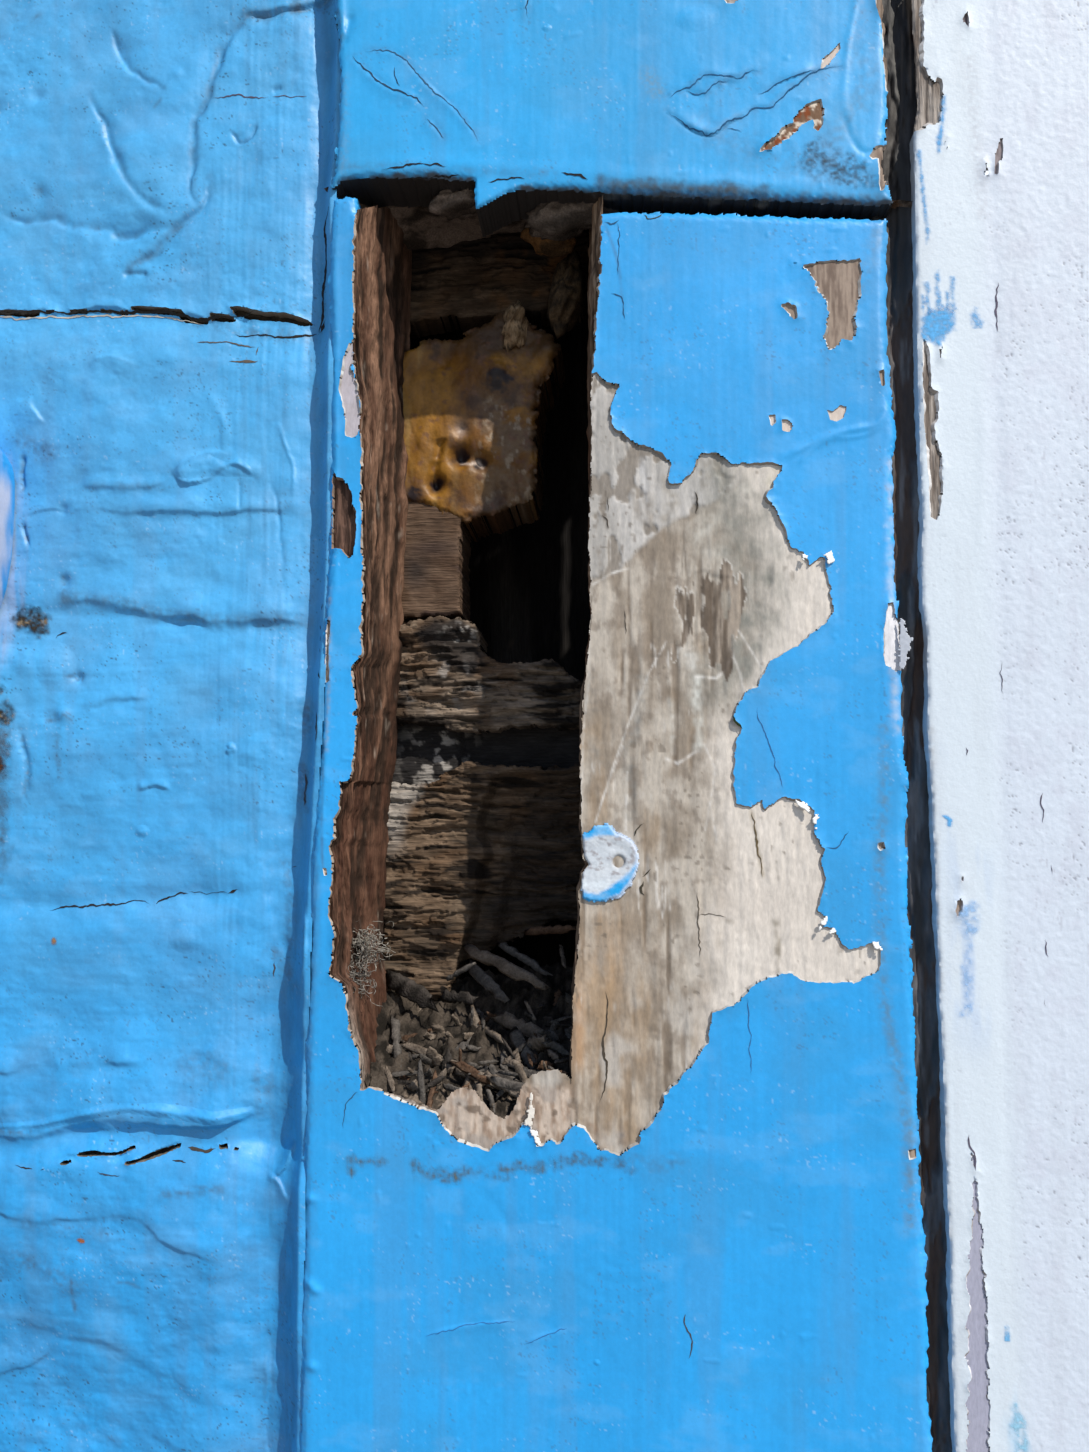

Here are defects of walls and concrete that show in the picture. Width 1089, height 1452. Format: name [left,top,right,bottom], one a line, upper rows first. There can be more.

peeling [876,0,888,92]
peeling [912,0,943,133]
peeling [870,145,888,191]
crack [0,207,329,363]
peeling [922,339,943,520]
spalling [323,205,412,1090]
peeling [384,196,883,1156]
crack [16,1143,239,1176]